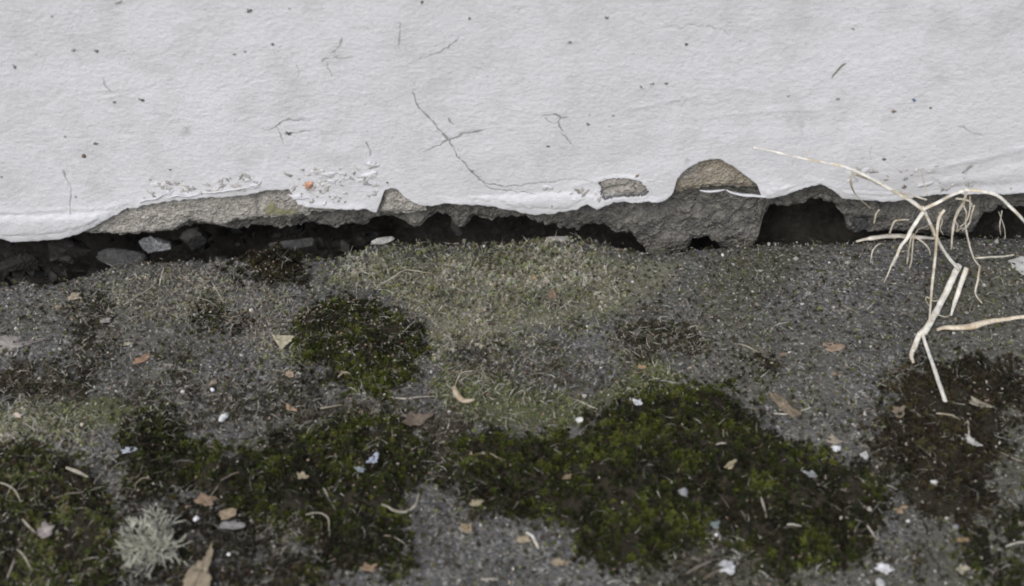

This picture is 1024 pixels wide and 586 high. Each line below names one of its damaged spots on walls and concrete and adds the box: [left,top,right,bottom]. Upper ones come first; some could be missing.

crack [413,93,584,194]
spalling [84,161,426,235]
peeling [541,185,604,203]
spalling [673,159,766,198]
peeling [846,164,976,193]